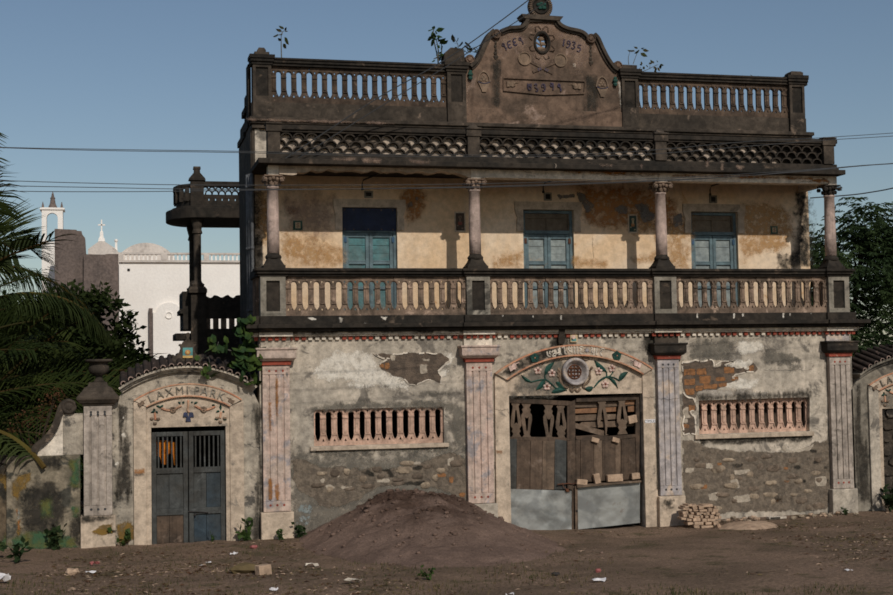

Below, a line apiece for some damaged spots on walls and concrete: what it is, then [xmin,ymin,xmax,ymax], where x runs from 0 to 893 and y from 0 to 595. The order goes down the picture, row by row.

peeling [400,189,426,220]
leakage [778,192,815,269]
peeling [312,350,454,390]
spalling [681,341,831,514]
leakage [43,456,62,470]
spalling [292,453,467,508]
leakage [17,482,109,543]